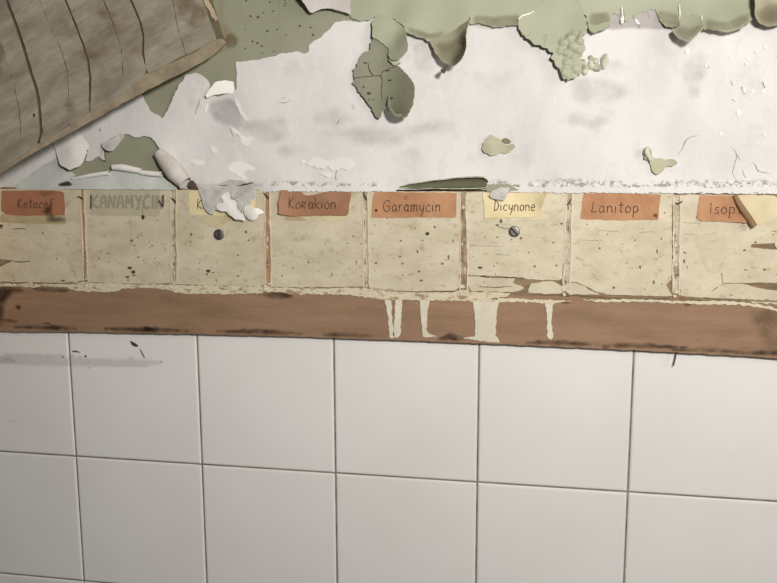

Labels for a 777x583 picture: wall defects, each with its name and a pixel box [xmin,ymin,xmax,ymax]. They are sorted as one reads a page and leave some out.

peeling [16,0,777,221]